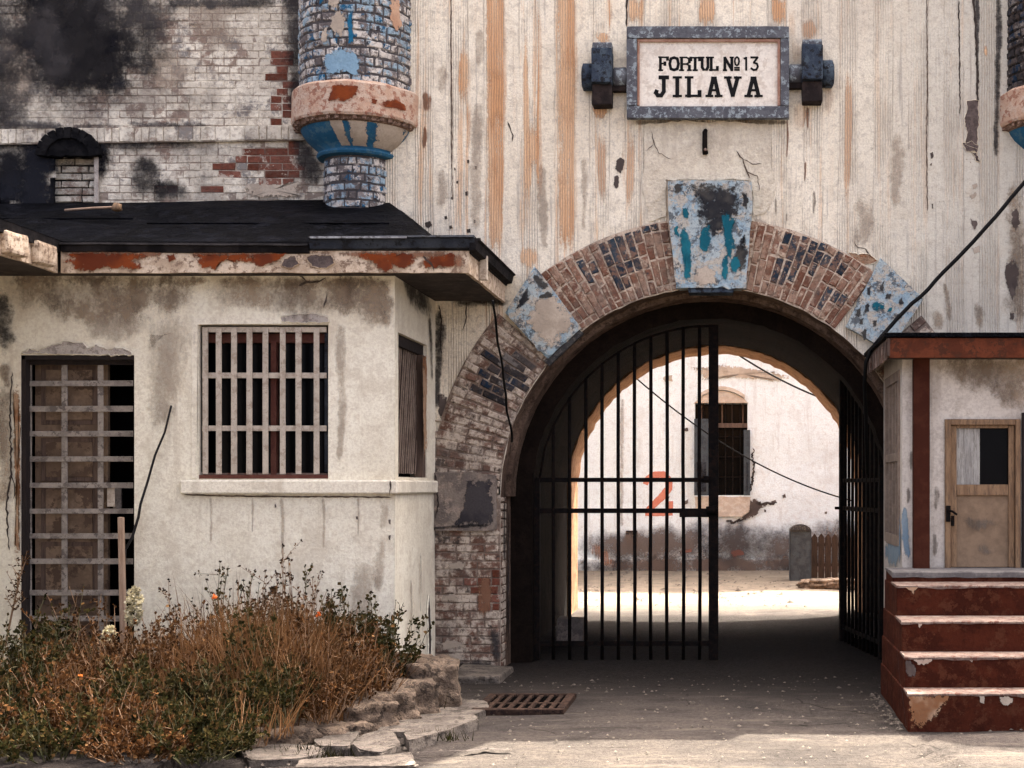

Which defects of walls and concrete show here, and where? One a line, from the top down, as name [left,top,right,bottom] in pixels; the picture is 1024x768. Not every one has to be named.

peeling [319,0,359,101]
flaking render [265,51,293,125]
damp [7,121,61,129]
flaking render [962,100,980,162]
flaking render [201,141,305,198]
crack [737,152,761,190]
peeling [65,252,146,271]
spalling [197,253,335,271]
peeling [674,183,749,286]
peeling [856,280,904,340]
spalling [742,494,786,519]
spalling [908,695,949,728]